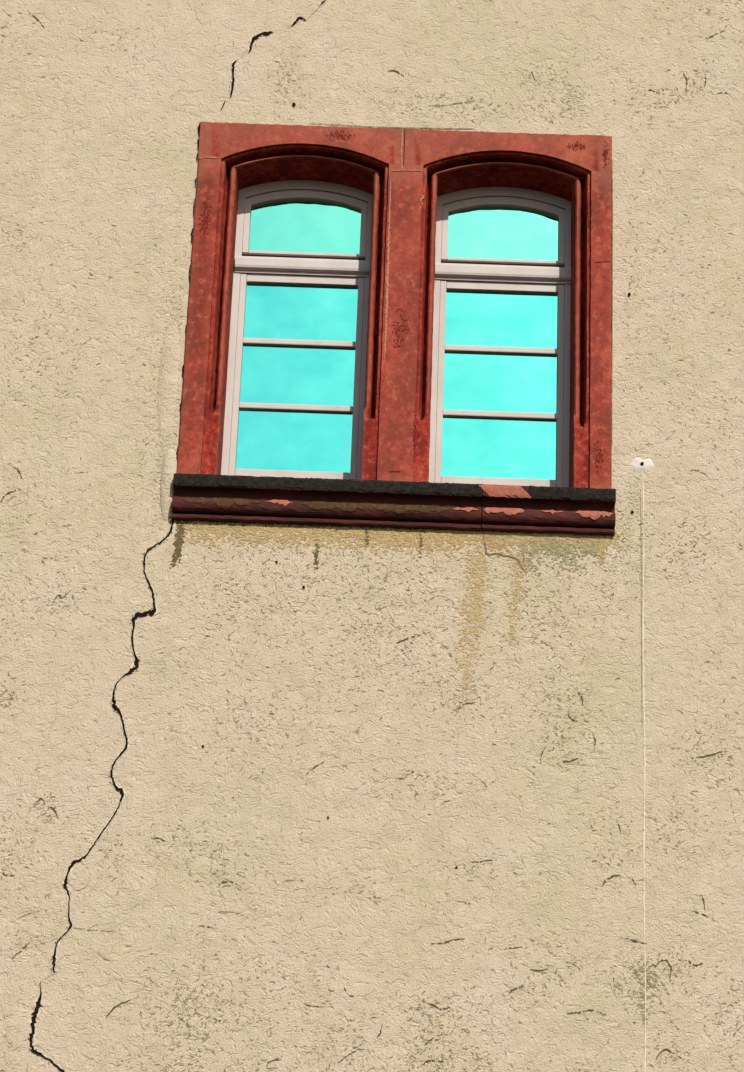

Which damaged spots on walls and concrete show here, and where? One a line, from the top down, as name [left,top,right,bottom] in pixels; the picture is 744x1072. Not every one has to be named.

crack [189,0,327,278]
spalling [453,484,532,515]
spalling [542,510,613,520]
leakage [168,517,626,715]
crack [13,520,176,1072]